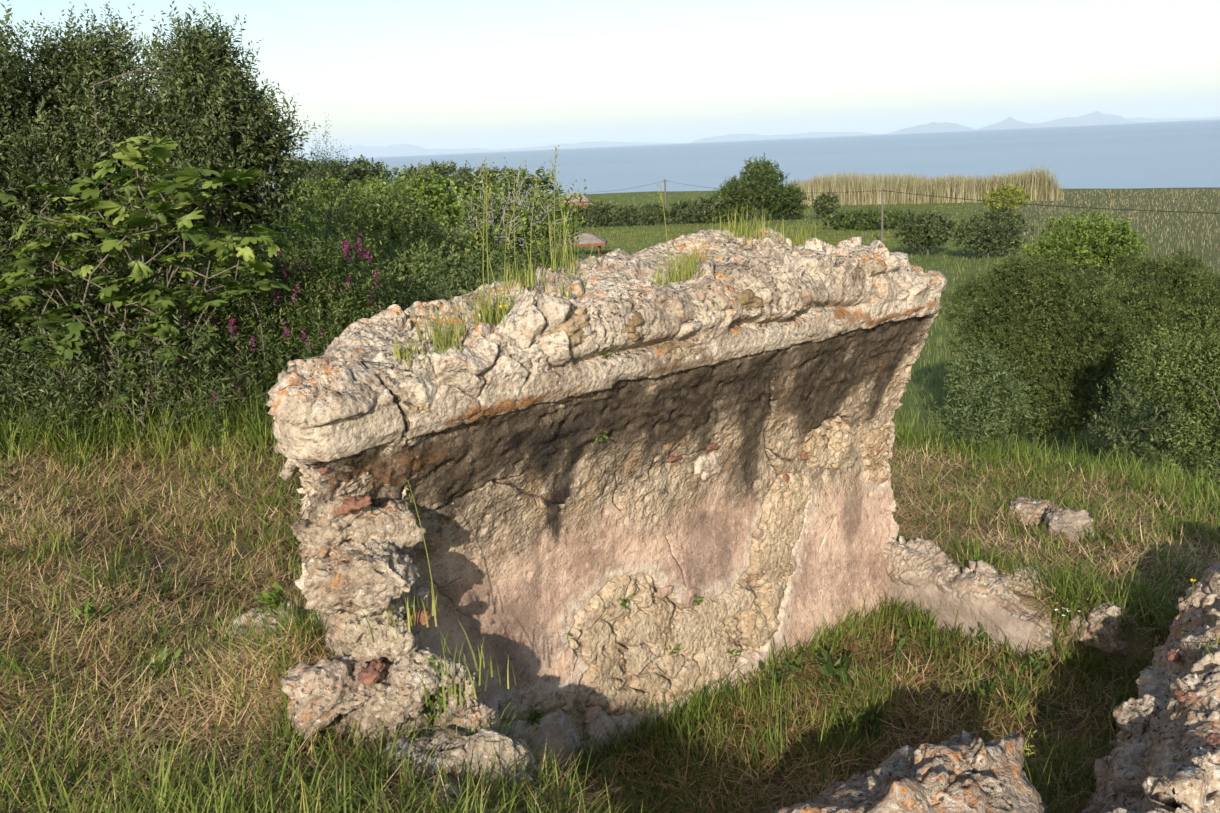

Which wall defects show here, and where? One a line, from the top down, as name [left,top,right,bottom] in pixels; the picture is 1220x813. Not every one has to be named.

crack [492,469,545,500]
leakage [295,315,928,544]
spalling [498,415,891,741]